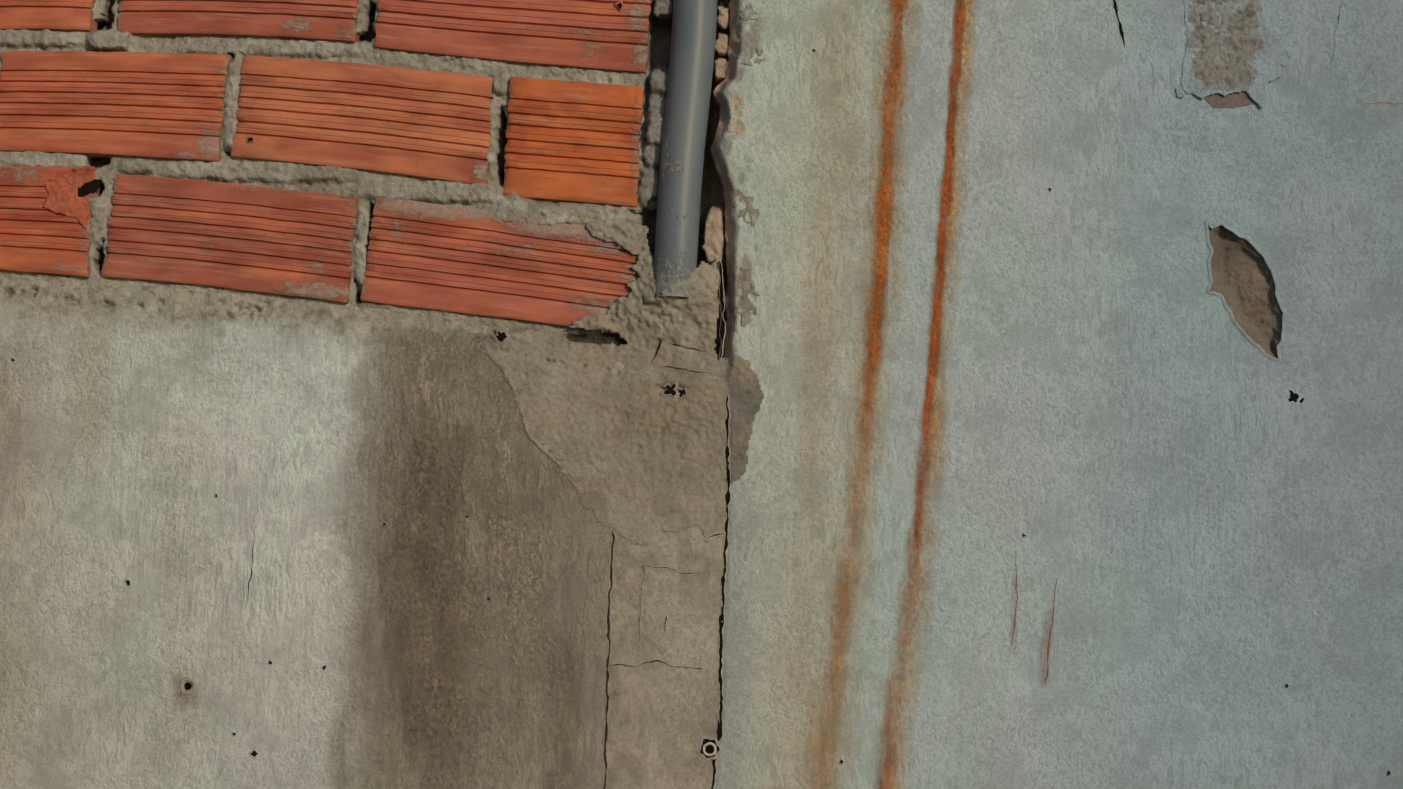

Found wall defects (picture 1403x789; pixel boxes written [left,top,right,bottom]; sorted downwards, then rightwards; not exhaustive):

spalling [42,166,102,228]
corrosion [860,0,905,441]
corrosion [915,0,974,548]
crack [1111,0,1126,47]
peeling [1175,0,1292,109]
spalling [1204,220,1287,361]
water stain [359,332,572,789]
crack [601,261,731,789]